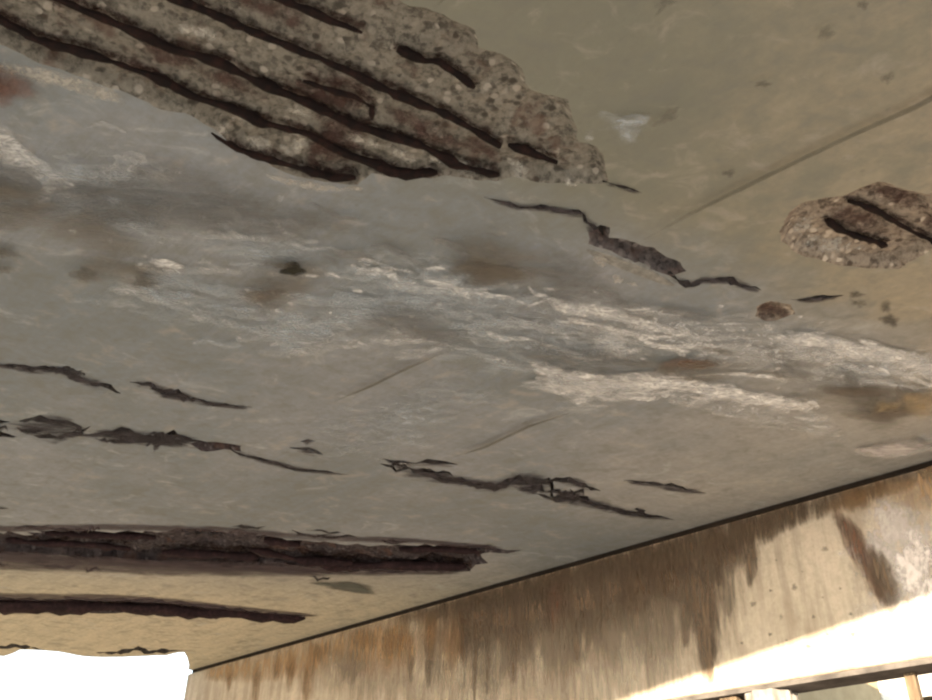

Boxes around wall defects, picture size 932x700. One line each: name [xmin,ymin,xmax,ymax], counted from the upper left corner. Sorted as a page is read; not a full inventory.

spalling [0,0,609,185]
crack [485,197,762,291]
spalling [779,181,932,269]
crack [0,364,247,409]
water stain [114,252,932,436]
crack [0,415,344,475]
crack [382,458,673,520]
water stain [861,435,931,456]
spalling [0,594,315,624]
spalling [0,524,520,594]
water stain [206,536,757,700]
water stain [849,500,932,653]